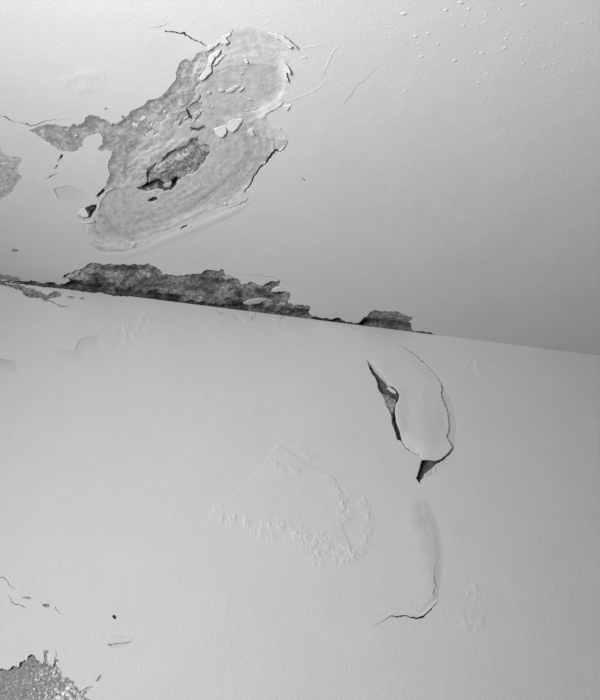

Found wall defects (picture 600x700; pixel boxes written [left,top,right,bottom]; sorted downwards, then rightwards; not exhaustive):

peeling [30,28,297,248]
spalling [0,149,22,201]
spalling [0,263,436,335]
flaking render [369,346,457,484]
crack [378,580,437,624]
spalling [0,649,101,700]